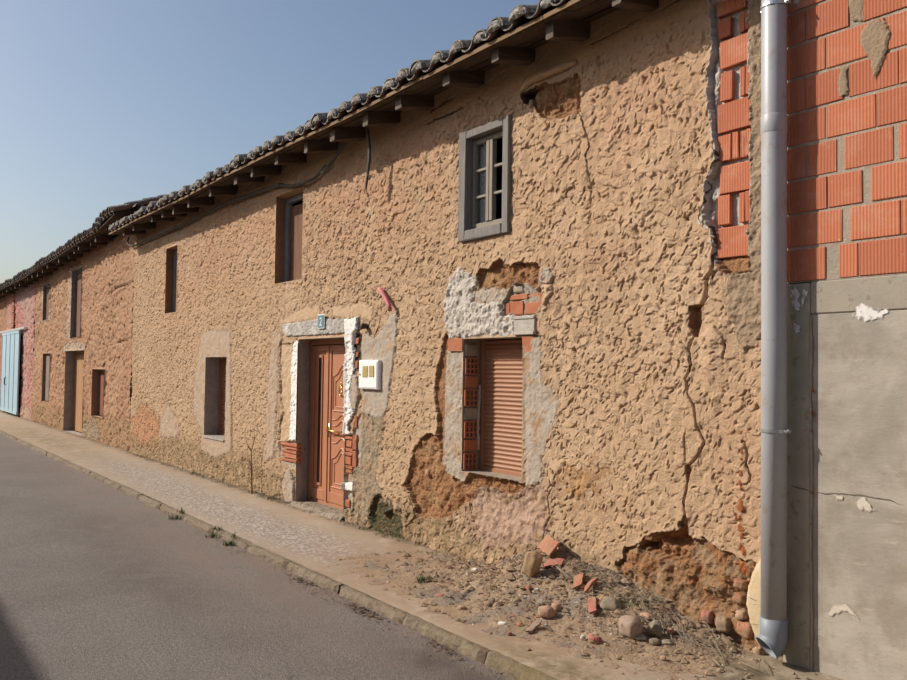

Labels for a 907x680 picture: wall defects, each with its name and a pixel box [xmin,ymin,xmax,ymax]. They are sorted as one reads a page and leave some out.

crack [426,98,460,125]
spalling [520,60,581,119]
spalling [697,0,754,276]
crack [698,141,720,291]
spalling [476,258,554,319]
flaking render [341,317,362,510]
spalling [404,333,526,520]
crack [666,344,695,405]
spalling [615,515,758,650]